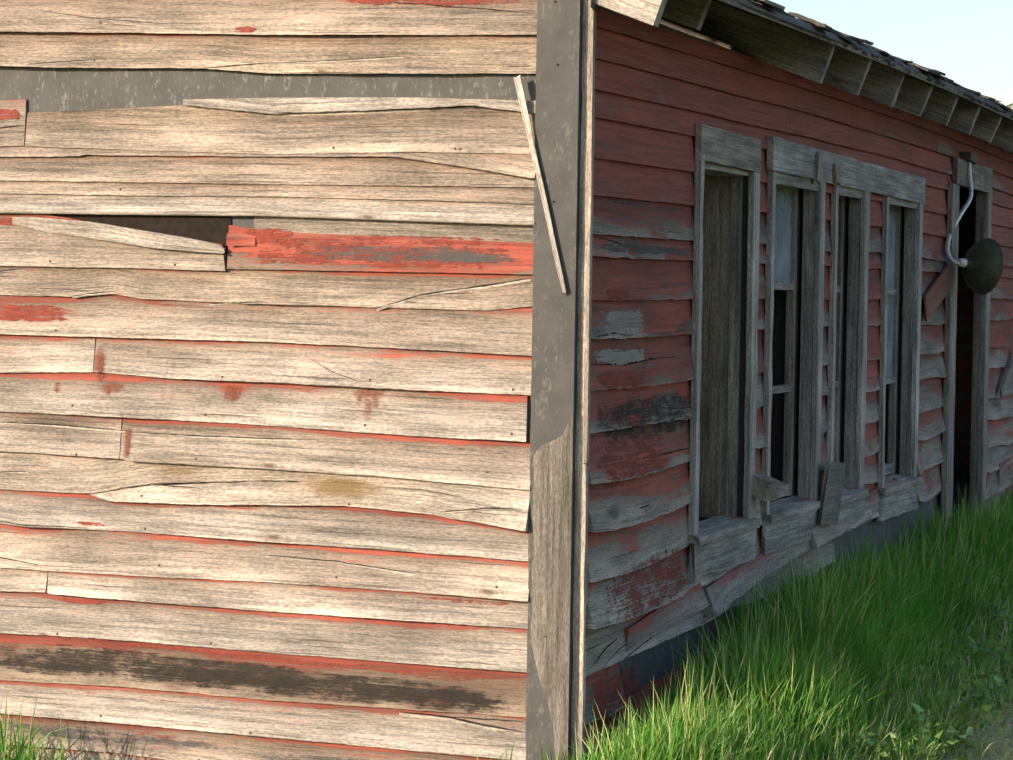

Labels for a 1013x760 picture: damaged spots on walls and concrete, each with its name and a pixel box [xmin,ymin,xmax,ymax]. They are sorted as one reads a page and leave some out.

peeling [243,228,514,269]
crack [377,278,530,311]
peeling [593,346,645,365]
crack [95,480,286,494]
crack [594,638,651,669]
water stain [0,643,508,713]